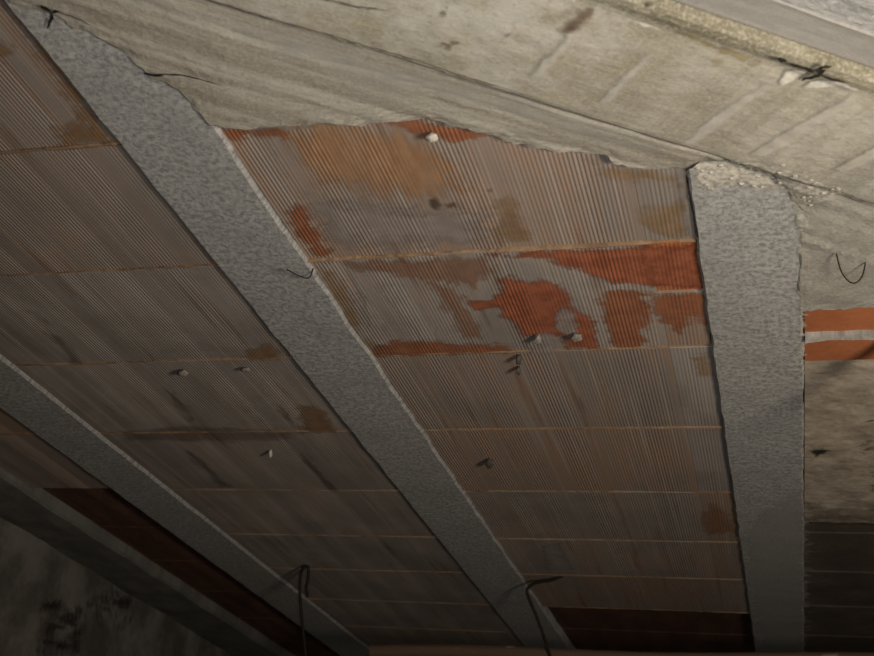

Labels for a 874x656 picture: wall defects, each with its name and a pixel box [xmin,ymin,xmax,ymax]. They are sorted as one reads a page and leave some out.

peeling [222,128,288,140]
peeling [390,120,489,143]
peeling [289,206,332,256]
peeling [346,244,708,357]